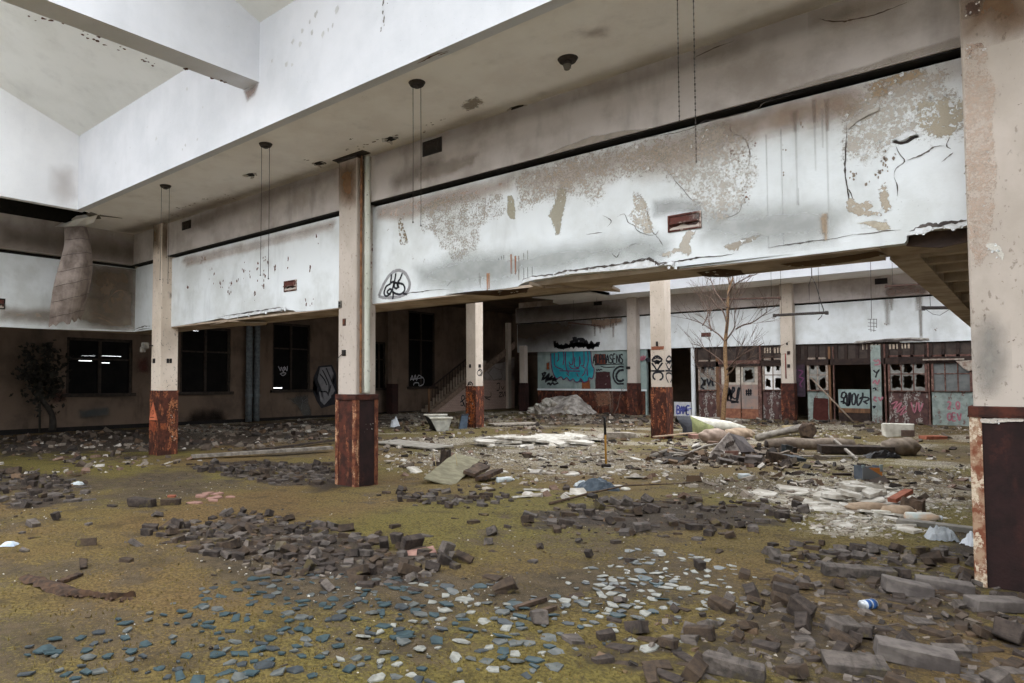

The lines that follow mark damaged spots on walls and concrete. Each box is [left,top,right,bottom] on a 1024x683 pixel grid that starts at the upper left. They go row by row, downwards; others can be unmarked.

crack [821,2,907,23]
peeling [421,125,761,259]
crack [844,125,853,199]
peeling [842,69,967,230]
crack [894,137,953,195]
spalling [446,222,699,296]
rust [168,400,178,441]